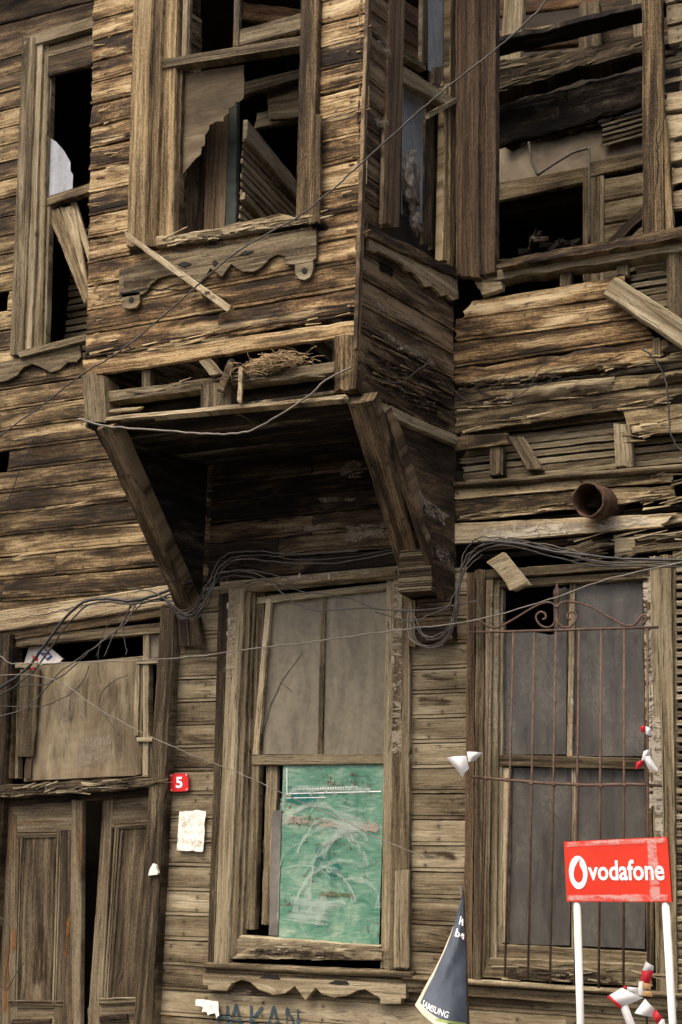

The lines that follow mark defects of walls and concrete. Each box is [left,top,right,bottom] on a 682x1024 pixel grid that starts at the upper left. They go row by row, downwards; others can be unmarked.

peeling [390,580,403,753]
peeling [643,576,664,837]